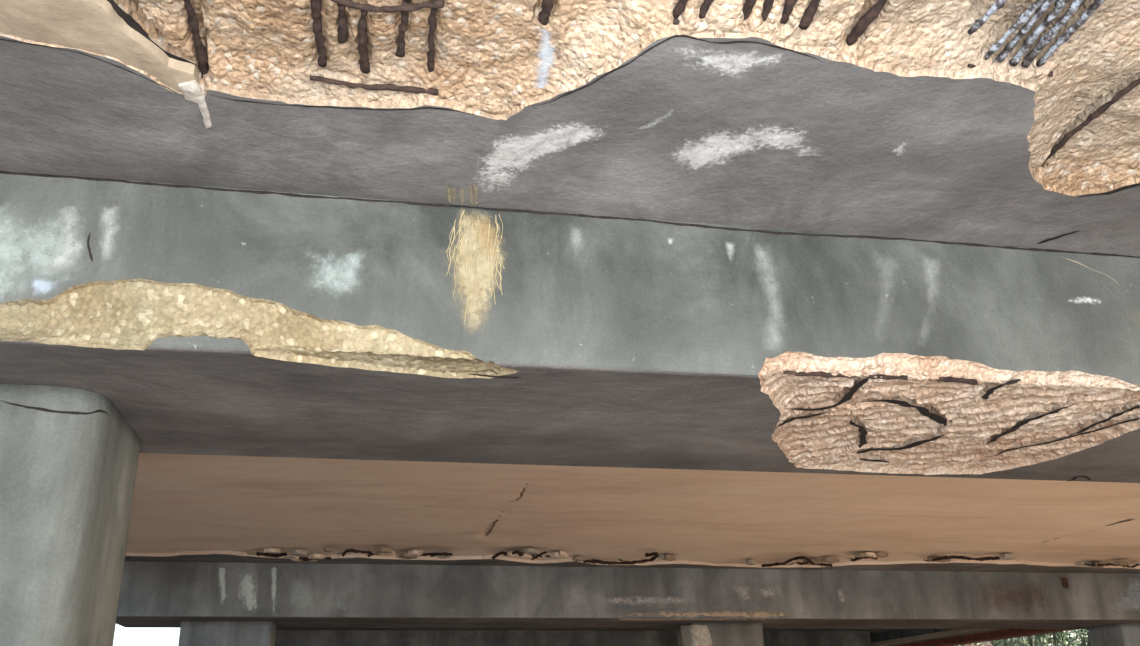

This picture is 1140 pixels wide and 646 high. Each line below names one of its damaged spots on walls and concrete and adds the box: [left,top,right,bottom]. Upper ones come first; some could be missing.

spalling [0,0,1140,196]
leakage [473,123,601,191]
leakage [673,125,816,169]
leakage [0,217,77,293]
leakage [105,211,114,250]
spalling [0,278,518,379]
crack [0,400,107,415]
spalling [125,351,1140,569]
crack [484,483,528,537]